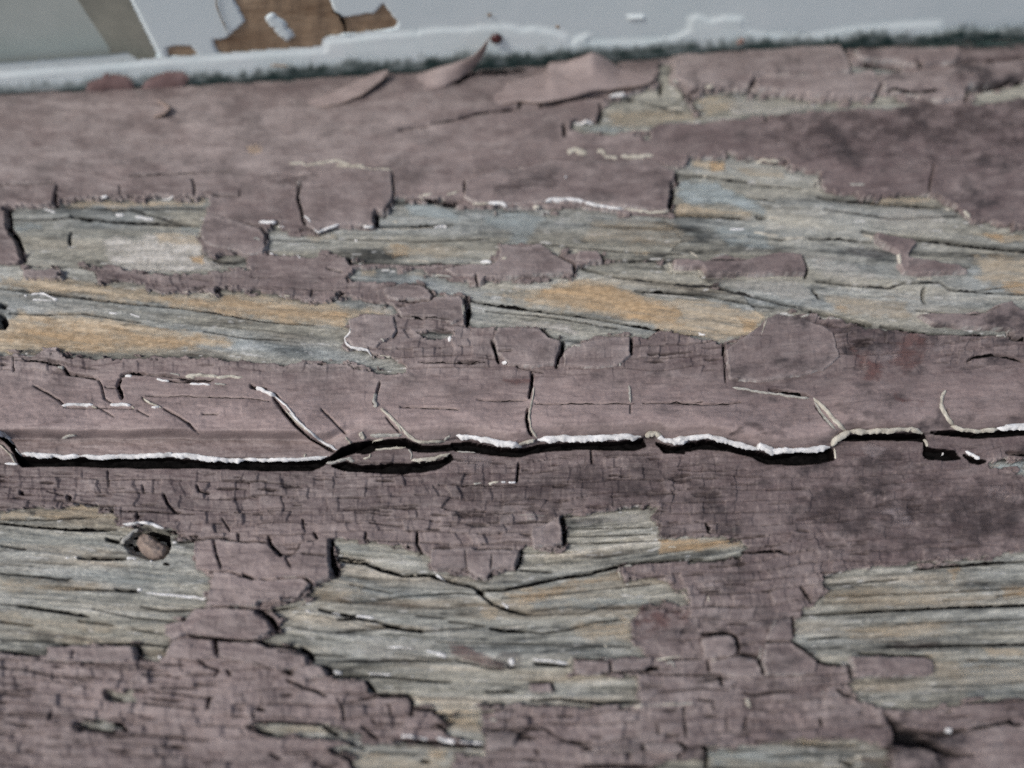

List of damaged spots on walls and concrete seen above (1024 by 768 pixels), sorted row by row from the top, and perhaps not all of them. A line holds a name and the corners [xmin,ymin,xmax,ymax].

peeling [0,147,1024,383]
crack [12,356,269,435]
crack [421,358,485,366]
crack [479,366,741,405]
crack [121,487,265,566]
crack [747,548,786,556]
peeling [0,505,1024,768]
crack [148,660,232,710]
crack [270,671,454,767]